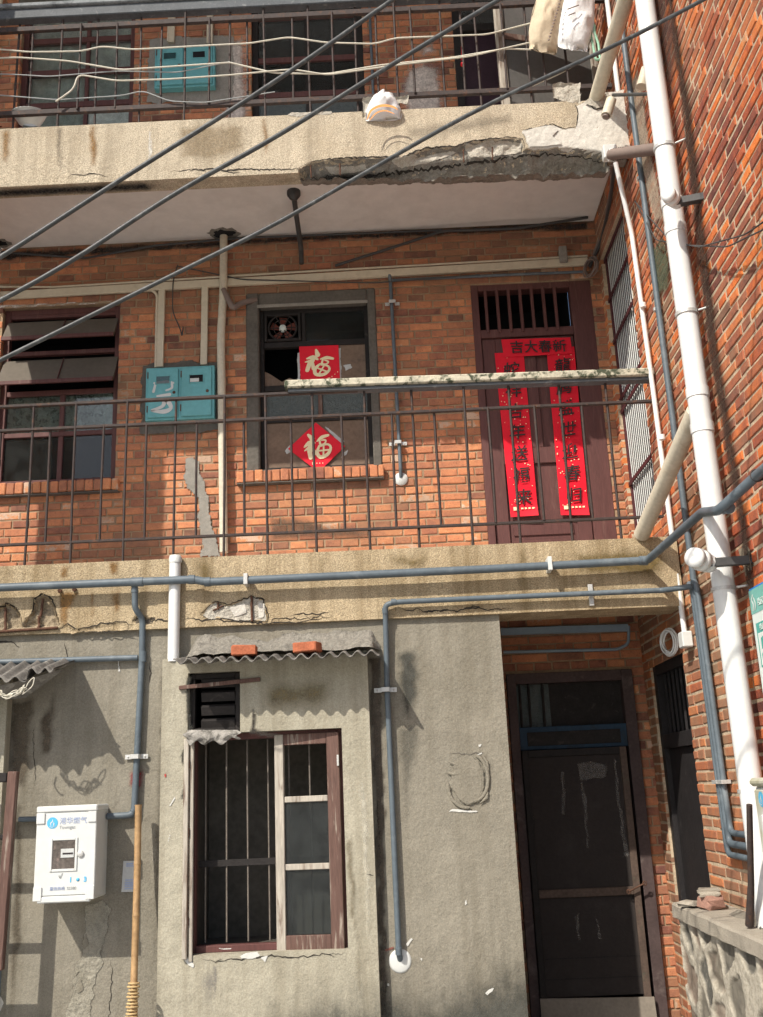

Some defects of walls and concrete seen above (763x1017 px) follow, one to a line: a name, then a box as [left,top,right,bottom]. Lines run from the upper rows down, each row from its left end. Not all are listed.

crack [175,166,297,174]
spalling [297,125,610,186]
spalling [0,594,155,634]
spalling [200,595,268,622]
leakage [364,653,528,1017]